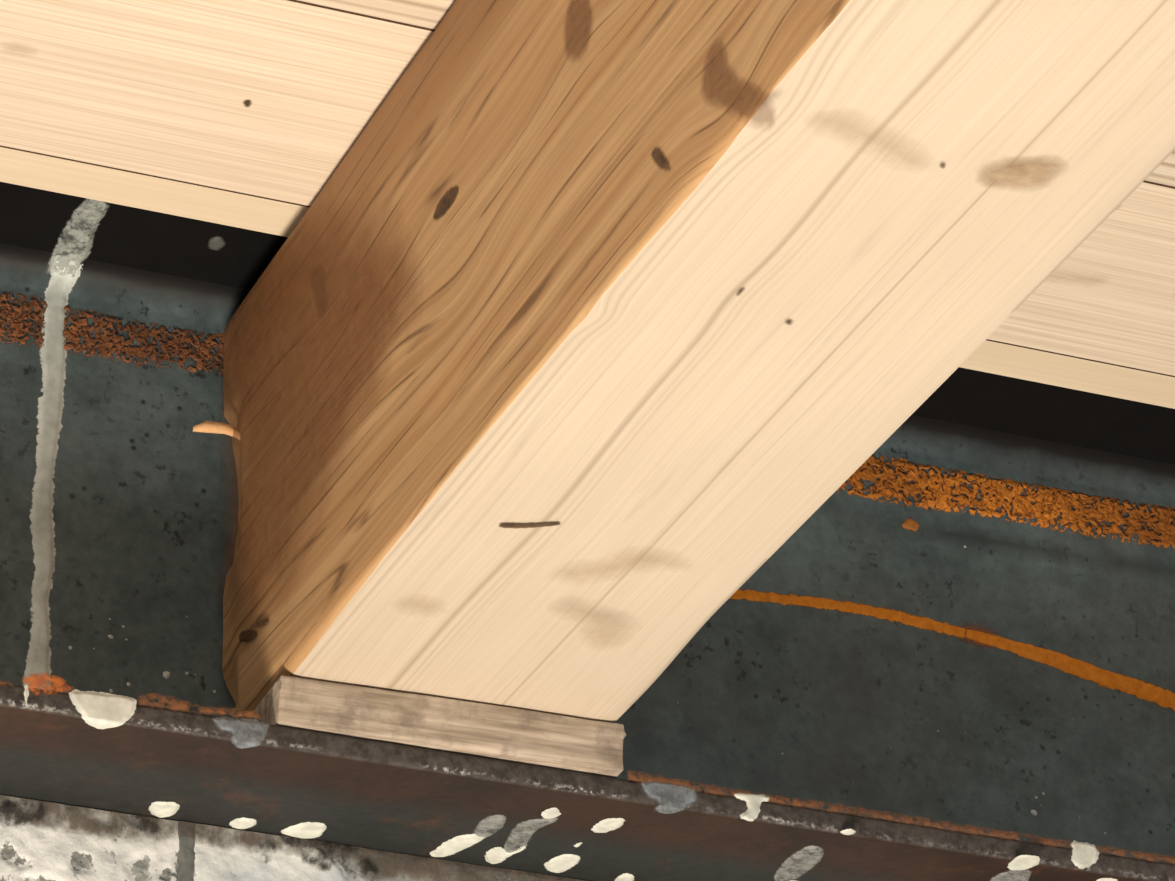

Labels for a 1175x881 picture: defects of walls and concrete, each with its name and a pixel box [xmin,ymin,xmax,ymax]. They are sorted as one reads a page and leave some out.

rust [0,292,48,348]
rust [62,305,224,375]
rust [837,455,1175,548]
rust [0,674,72,695]
rust [138,693,261,718]
rust [628,770,1072,848]
peeling [0,797,179,881]
peeling [193,828,347,881]
rust [1096,846,1175,864]